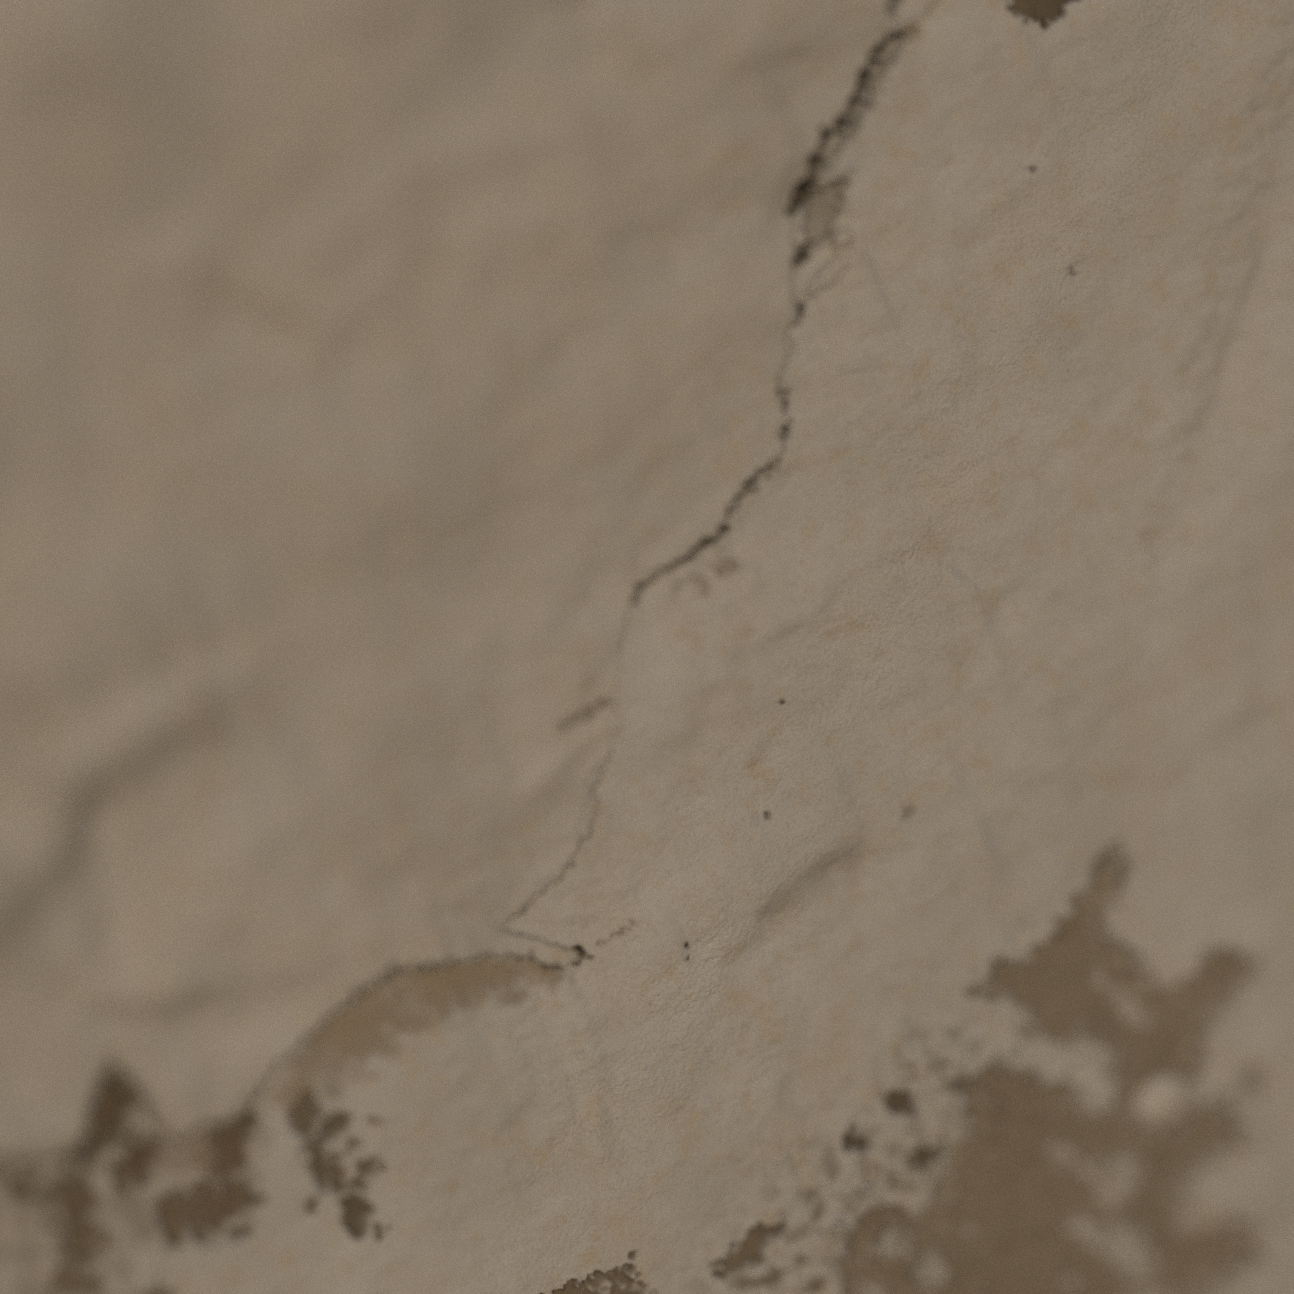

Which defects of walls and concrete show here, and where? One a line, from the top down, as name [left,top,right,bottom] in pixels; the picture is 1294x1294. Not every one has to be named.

spalling [1006,0,1080,29]
crack [632,0,938,604]
flaking render [0,0,896,1294]
crack [482,920,635,970]
spalling [832,840,1264,1294]